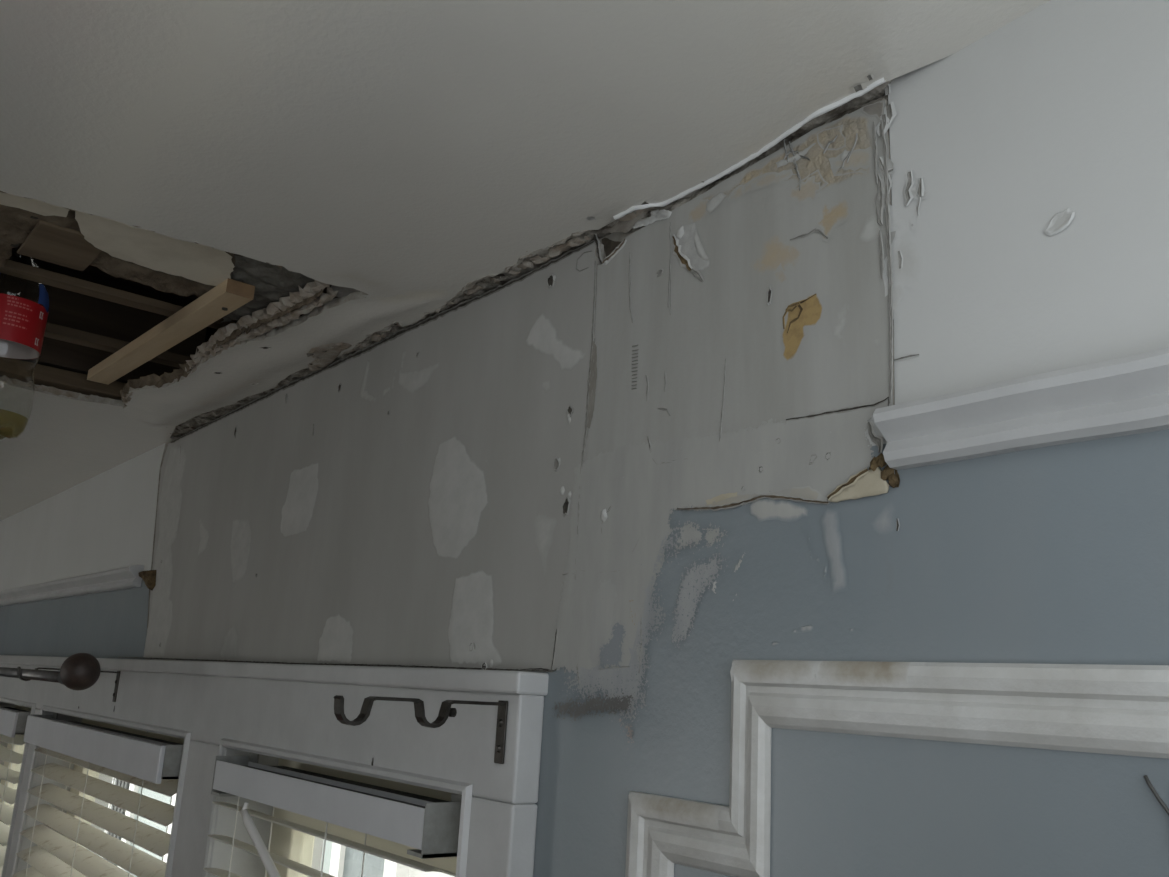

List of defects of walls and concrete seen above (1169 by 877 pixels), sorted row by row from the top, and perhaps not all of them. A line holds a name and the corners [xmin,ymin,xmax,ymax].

flaking render [0,191,80,268]
flaking render [90,251,216,298]
flaking render [0,280,338,408]
flaking render [170,77,897,443]
crack [575,261,612,564]
flaking render [552,397,900,675]
leakage [781,292,823,362]
crack [786,120,919,453]